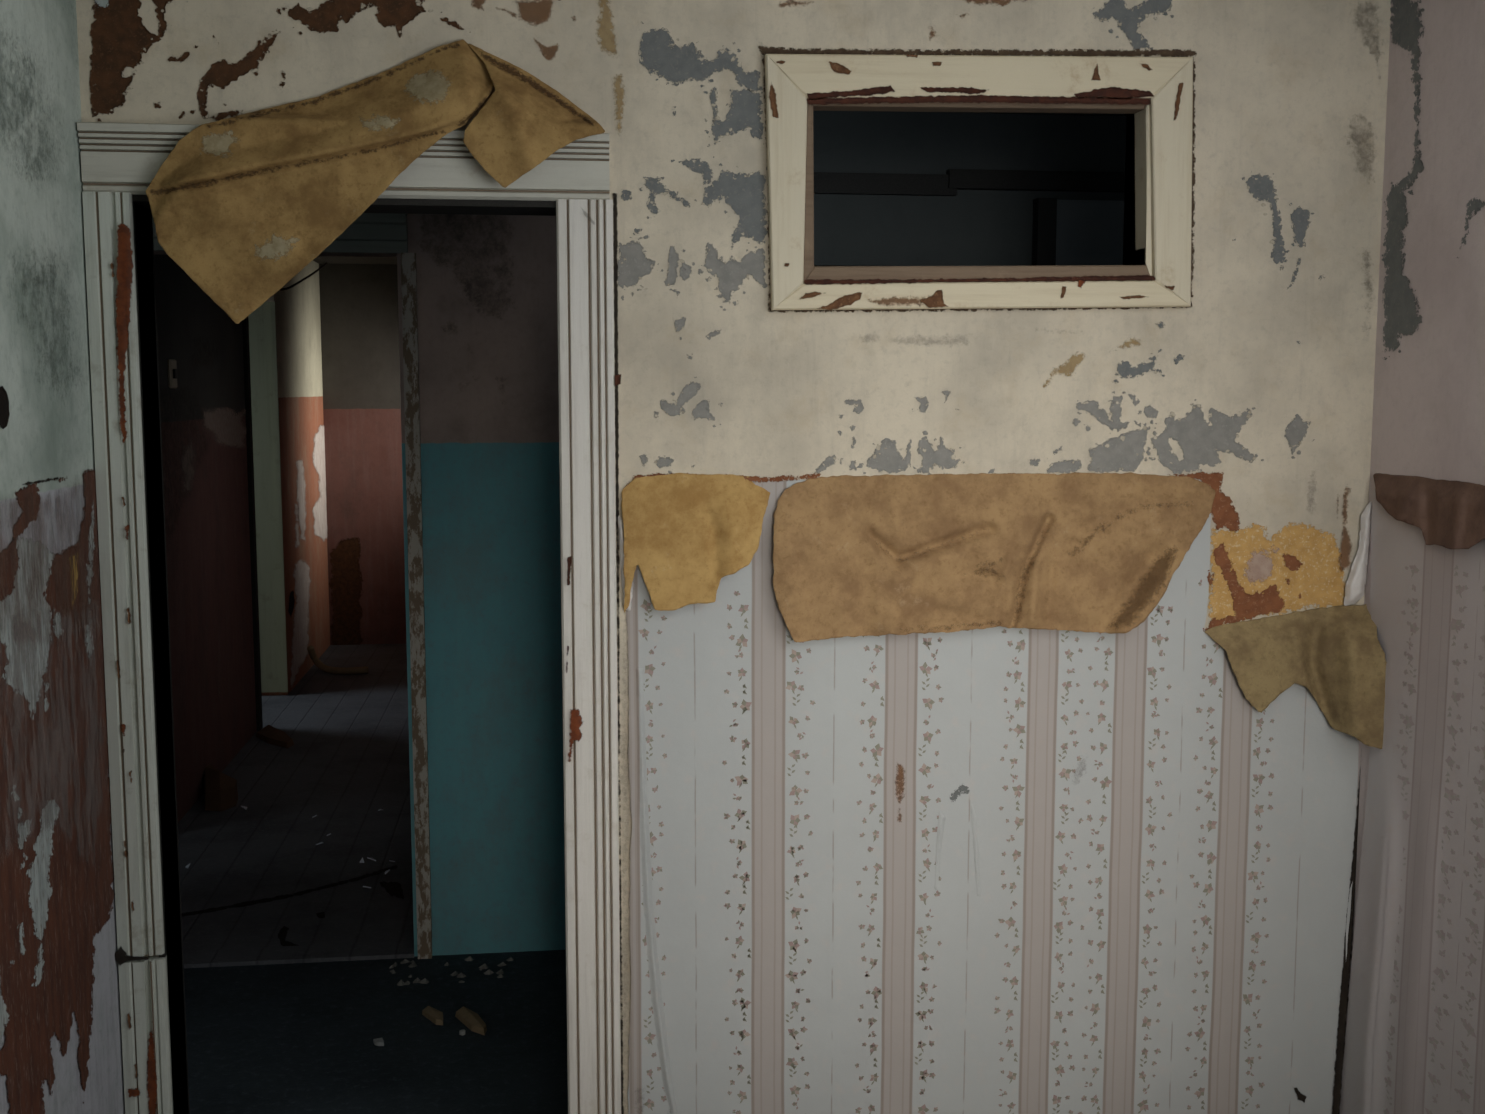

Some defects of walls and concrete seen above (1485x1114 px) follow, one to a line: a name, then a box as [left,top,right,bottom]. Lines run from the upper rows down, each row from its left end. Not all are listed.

peeling [89,0,187,122]
peeling [168,0,464,121]
peeling [502,0,561,60]
peeling [807,61,1154,105]
peeling [1091,0,1174,71]
peeling [1174,83,1183,120]
peeling [617,23,789,311]
peeling [1242,171,1314,289]
peeling [1381,0,1424,360]
peeling [800,275,1175,310]
peeling [725,399,964,483]
peeling [0,469,134,1114]